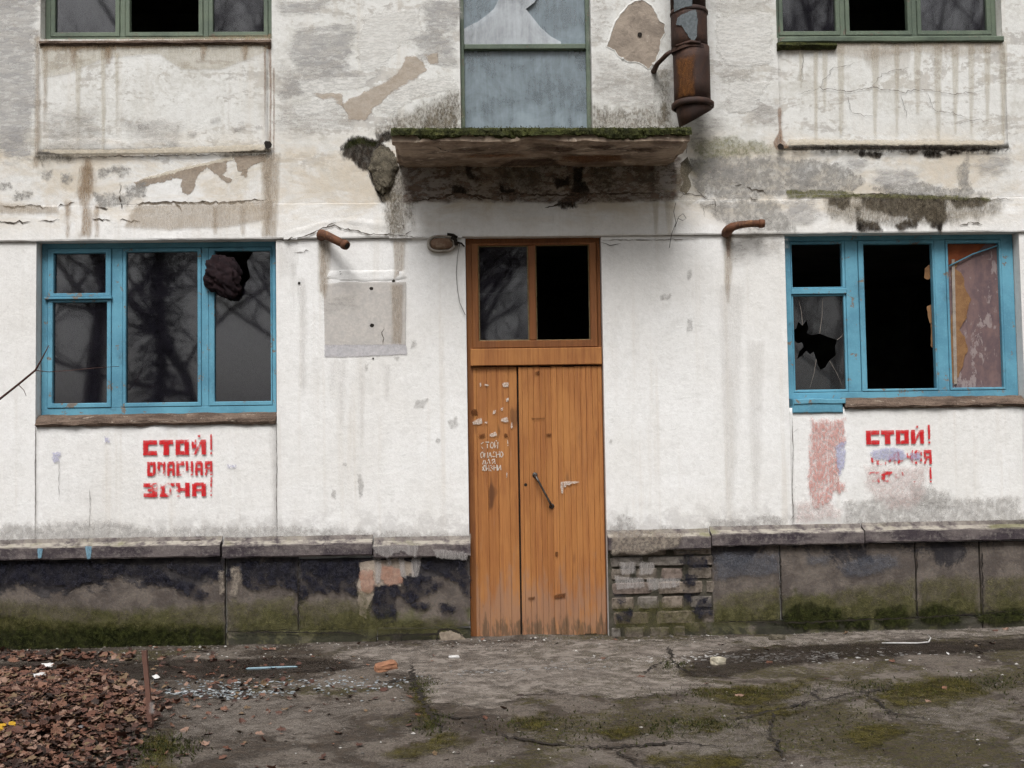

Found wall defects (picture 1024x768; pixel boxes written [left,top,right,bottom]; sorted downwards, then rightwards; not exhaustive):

water stain [45,40,130,62]
water stain [143,36,266,57]
peeling [280,1,461,120]
spalling [605,0,667,71]
crack [801,58,988,148]
peeling [94,154,266,207]
spalling [368,144,399,195]
water stain [690,137,998,233]
crack [787,144,919,152]
peeling [0,558,472,625]